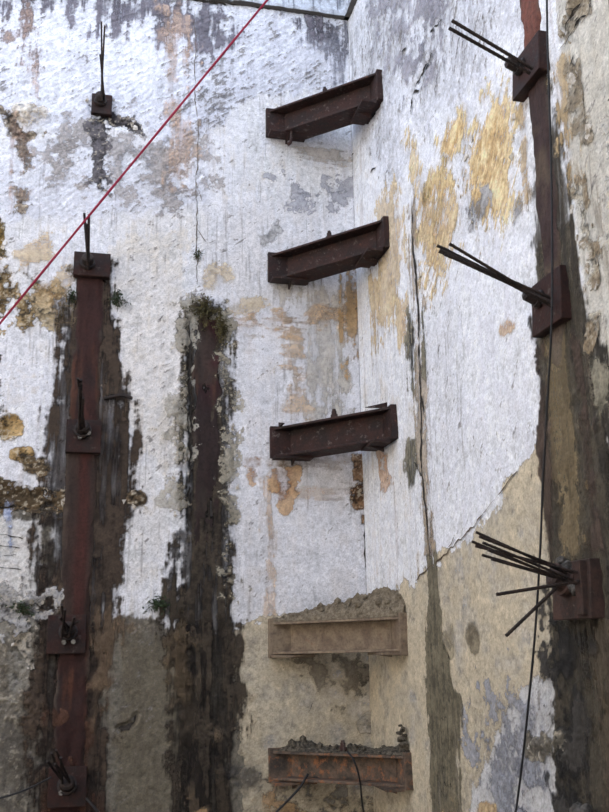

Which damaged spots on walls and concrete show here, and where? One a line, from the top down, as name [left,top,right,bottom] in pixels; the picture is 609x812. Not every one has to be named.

water stain [105,123,225,222]
peeling [400,75,523,308]
spalling [0,218,77,335]
spalling [0,382,50,477]
spalling [0,476,65,519]
water stain [150,295,253,812]
spalling [350,453,365,524]
water stain [403,437,417,488]
water stain [404,306,428,396]
crack [409,215,520,580]
water stain [425,109,609,812]
corrosion [535,341,553,560]